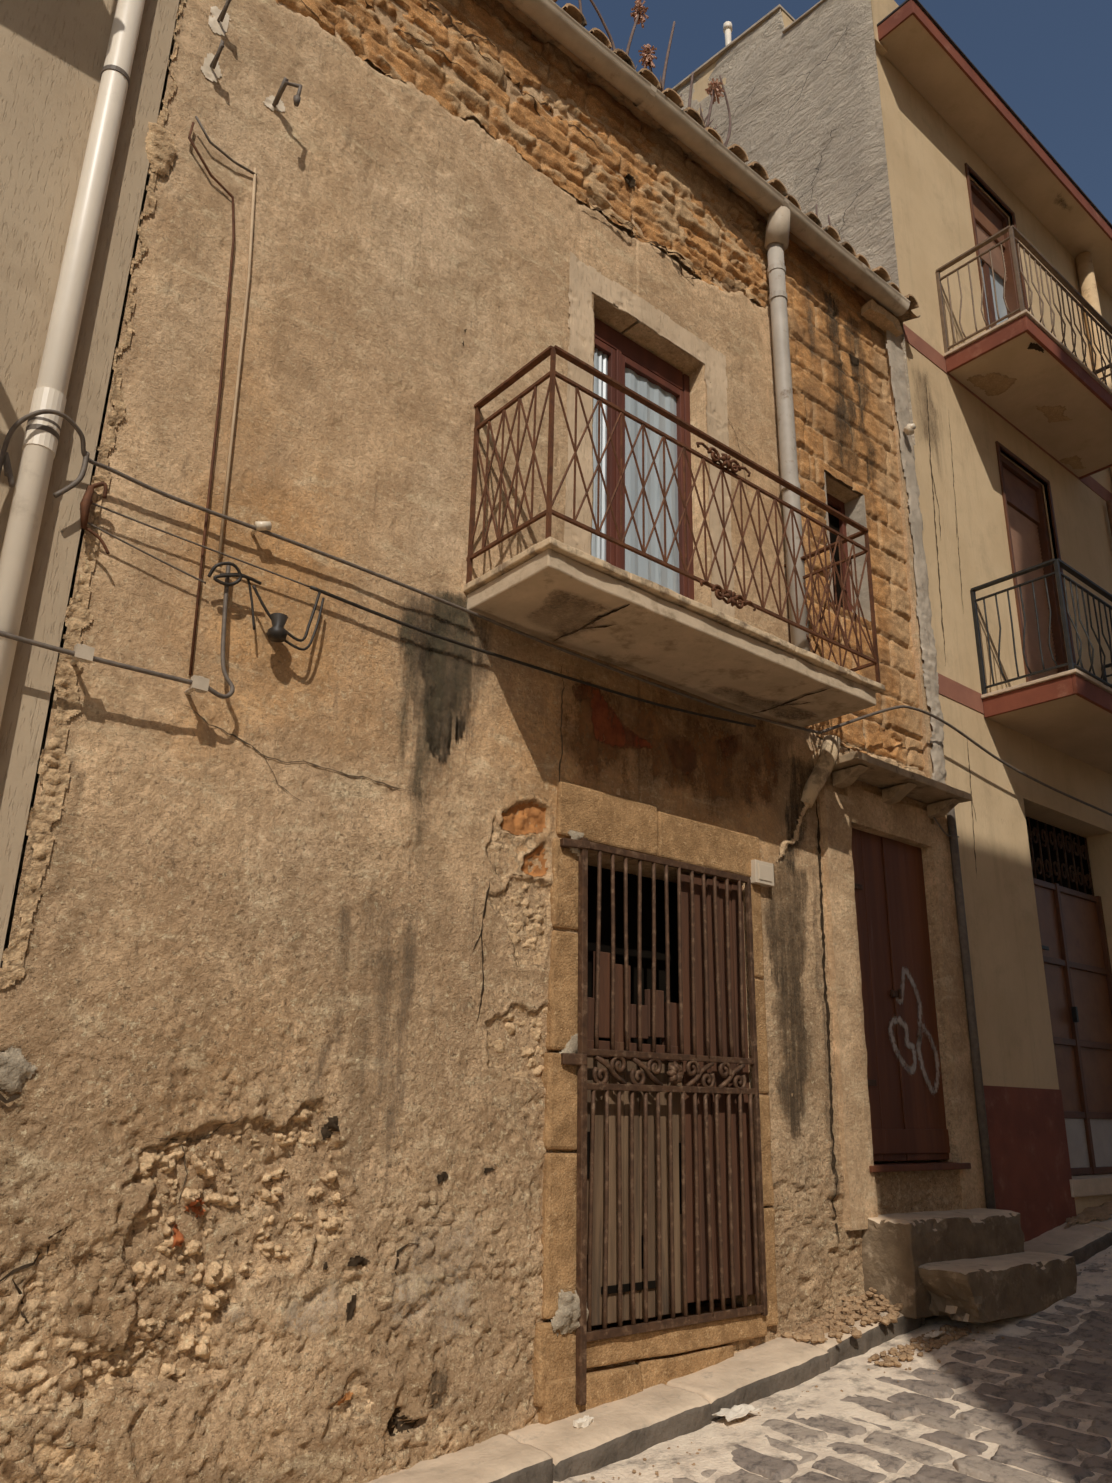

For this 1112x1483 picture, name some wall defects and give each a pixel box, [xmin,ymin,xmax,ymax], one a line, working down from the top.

crack [798,128,861,235]
damp [807,286,875,481]
crack [177,702,415,803]
damp [399,592,490,798]
crack [473,882,490,1020]
damp [563,680,818,1137]